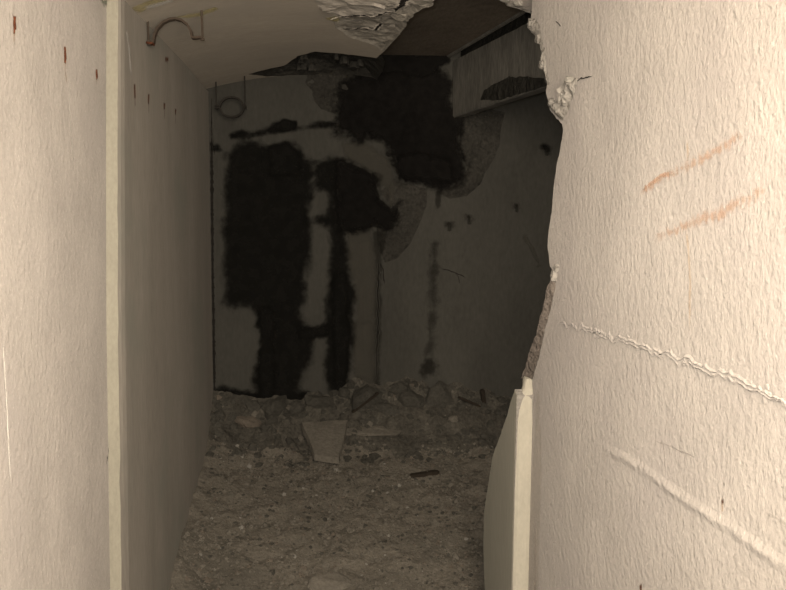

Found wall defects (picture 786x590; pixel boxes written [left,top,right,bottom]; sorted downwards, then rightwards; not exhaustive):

spalling [250,0,434,113]
damp [379,55,450,77]
spalling [438,0,592,199]
damp [215,119,455,400]
spalling [377,181,427,263]
spalling [521,264,559,379]